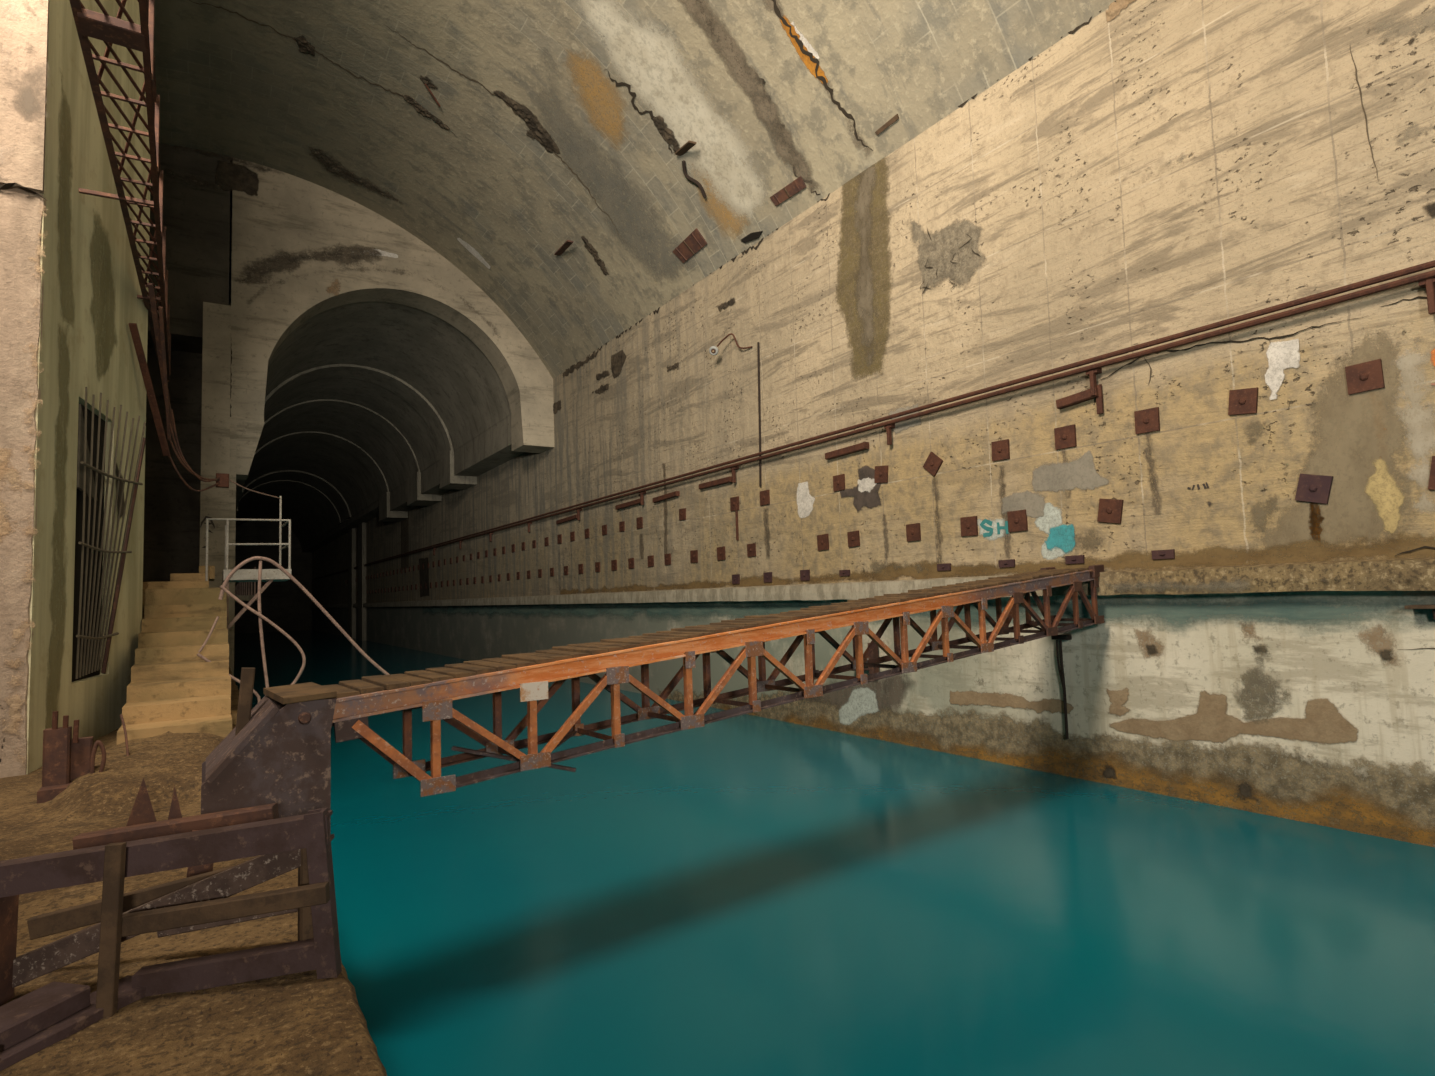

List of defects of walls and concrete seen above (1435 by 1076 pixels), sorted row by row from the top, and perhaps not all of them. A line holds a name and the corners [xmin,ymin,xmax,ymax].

crack [189,0,455,135]
crack [387,26,517,115]
spalling [493,91,560,154]
crack [765,0,873,152]
crack [0,183,46,200]
crack [554,153,627,247]
leakage [837,158,891,377]
spalling [911,219,985,294]
crack [1081,296,1427,392]